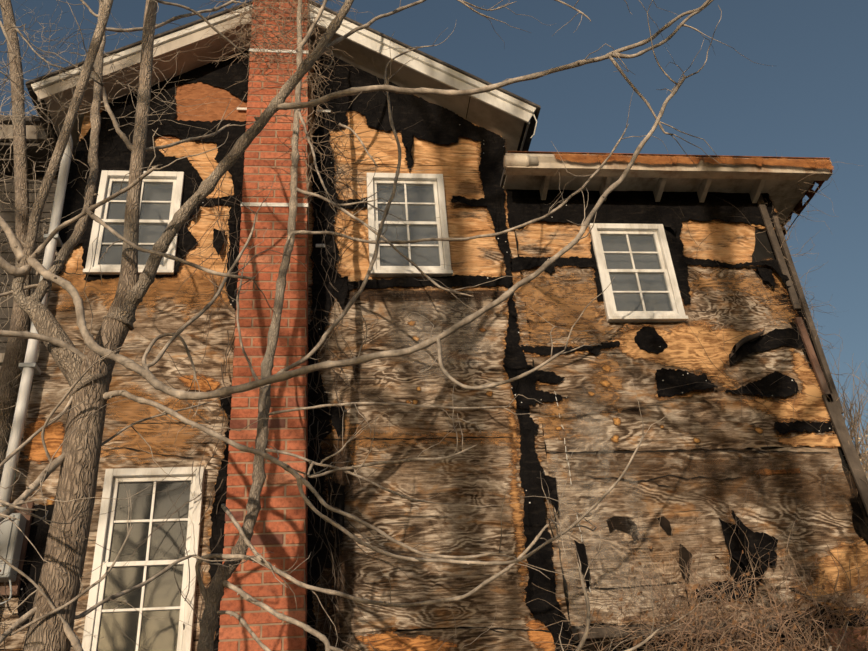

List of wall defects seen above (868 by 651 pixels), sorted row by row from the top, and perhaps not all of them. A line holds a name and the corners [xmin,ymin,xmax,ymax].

damp [345,289,503,310]
damp [321,440,362,514]
damp [573,449,865,519]
damp [315,524,362,651]